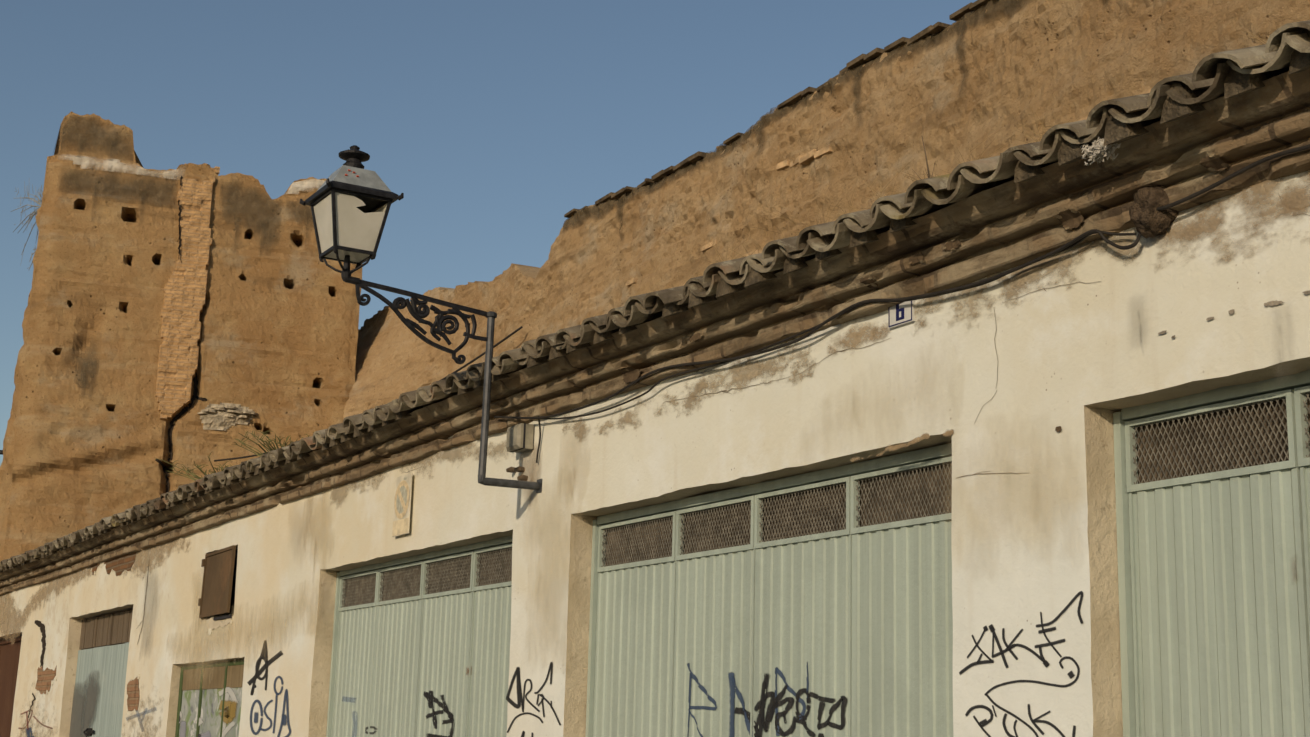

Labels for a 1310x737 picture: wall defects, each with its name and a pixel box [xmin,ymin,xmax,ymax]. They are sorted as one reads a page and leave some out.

crack [176,176,184,264]
crack [155,372,207,493]
peeling [0,538,188,643]
spalling [35,664,58,696]
spalling [126,674,151,737]